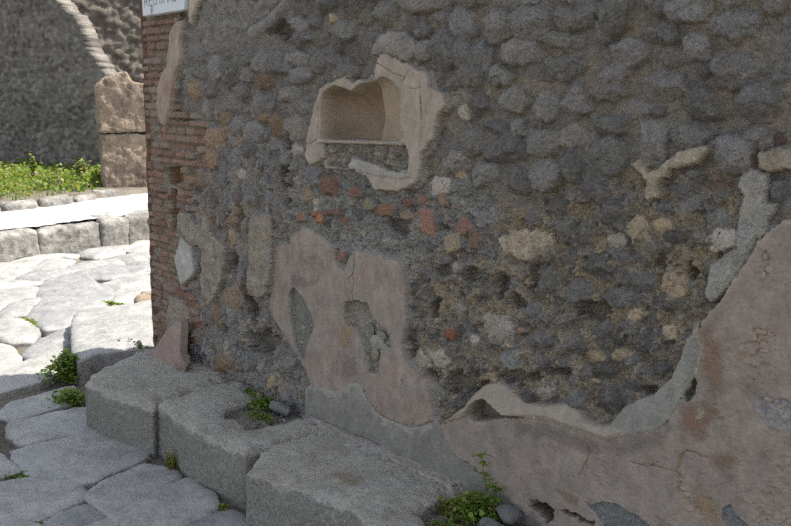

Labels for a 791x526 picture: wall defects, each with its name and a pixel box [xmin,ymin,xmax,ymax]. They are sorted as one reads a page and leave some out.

spalling [289,288,314,360]
spalling [344,300,391,374]
spalling [566,501,650,526]
spalling [721,503,748,526]